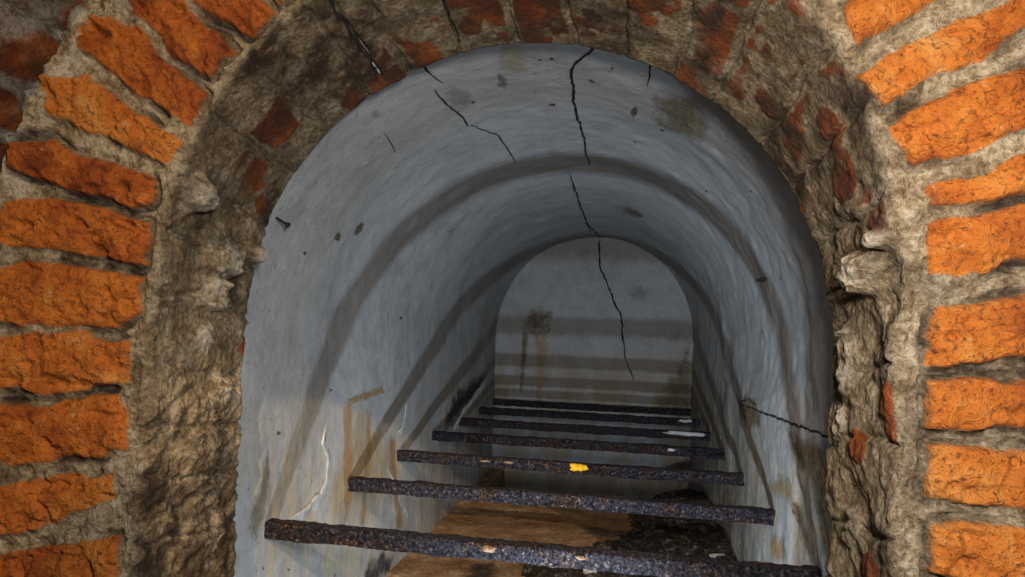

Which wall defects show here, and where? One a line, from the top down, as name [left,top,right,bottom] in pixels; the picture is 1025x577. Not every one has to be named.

crack [423,67,516,163]
crack [568,48,634,380]
rust [334,389,396,524]